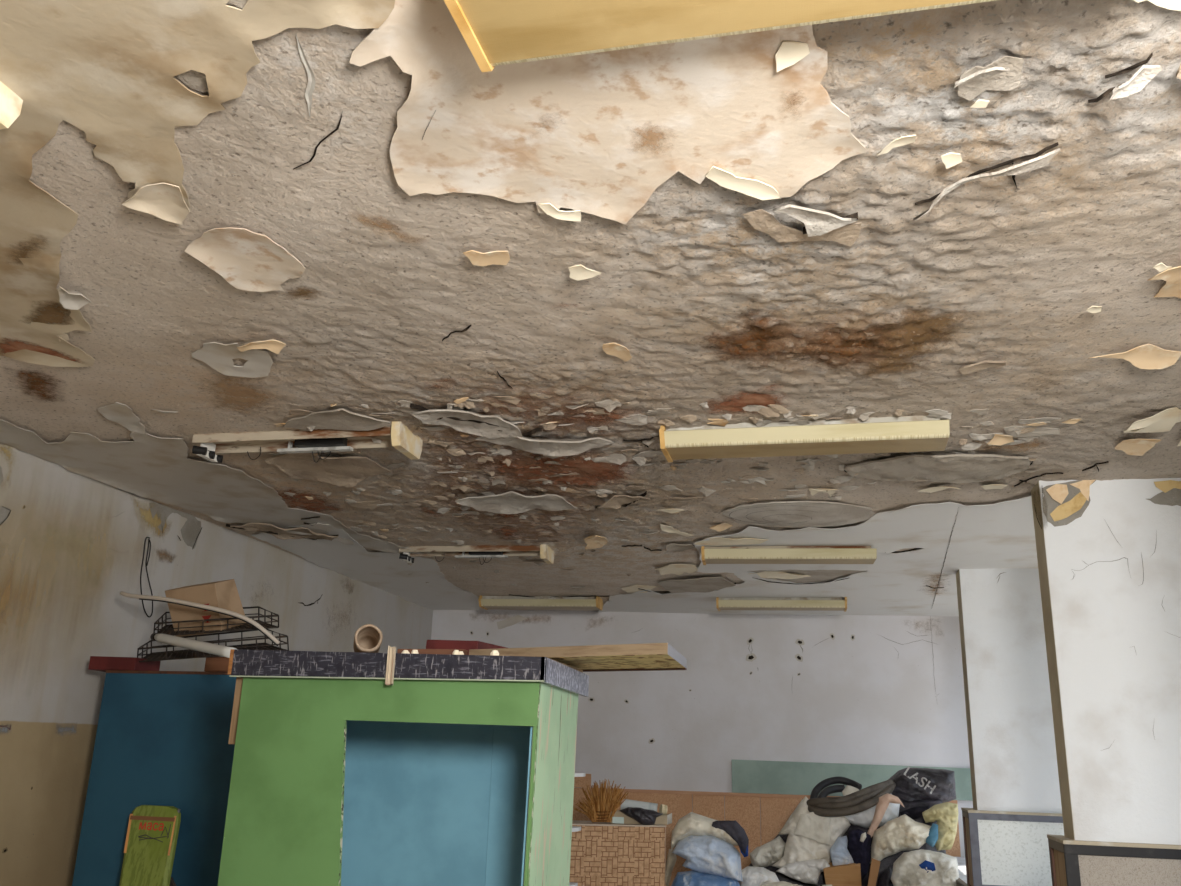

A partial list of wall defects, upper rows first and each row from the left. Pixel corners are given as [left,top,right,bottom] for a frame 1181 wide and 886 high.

crack [293,35,342,169]
crack [1088,53,1153,103]
peeling [0,0,916,367]
crack [915,142,1058,205]
spalling [913,148,1060,221]
spalling [411,409,615,456]
corrosion [480,398,627,439]
peeling [1115,407,1181,456]
peeling [0,402,481,611]
corrosion [443,434,627,540]
peeling [596,480,1096,616]
crack [1071,519,1180,638]